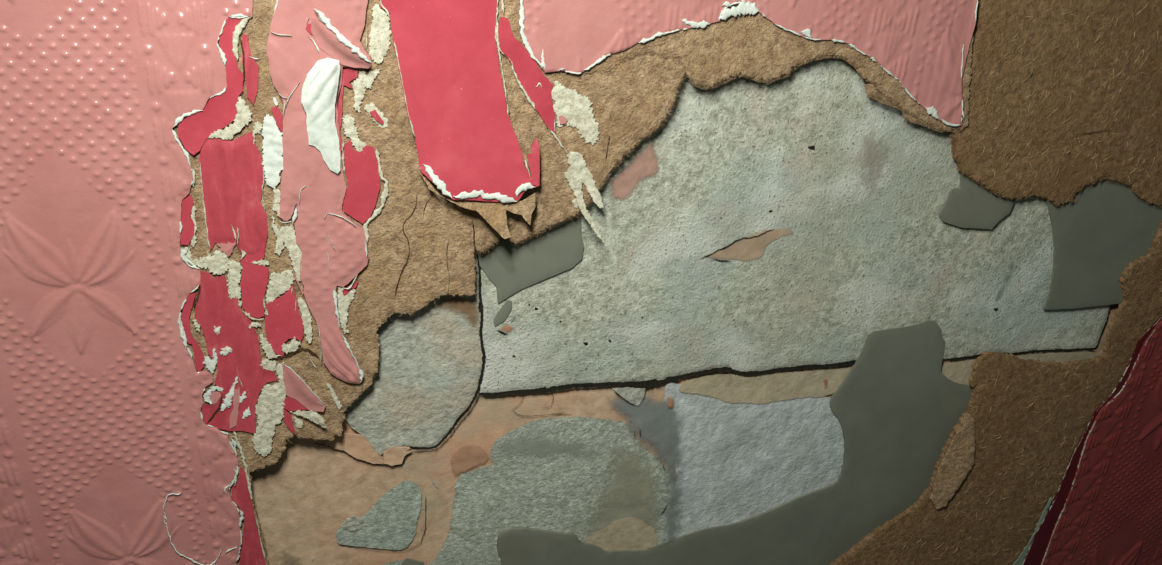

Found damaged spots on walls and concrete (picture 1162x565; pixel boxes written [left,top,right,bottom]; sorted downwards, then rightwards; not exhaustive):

peeling [177,17,304,565]
peeling [337,280,358,334]
peeling [338,68,389,243]
crack [395,196,430,295]
peeling [380,0,584,334]
crack [406,220,856,451]
flaking render [703,229,792,262]
peeling [938,173,1016,229]
crack [947,348,1094,361]
peeling [1043,179,1162,310]
flaking render [310,433,413,466]
peeling [336,320,977,565]